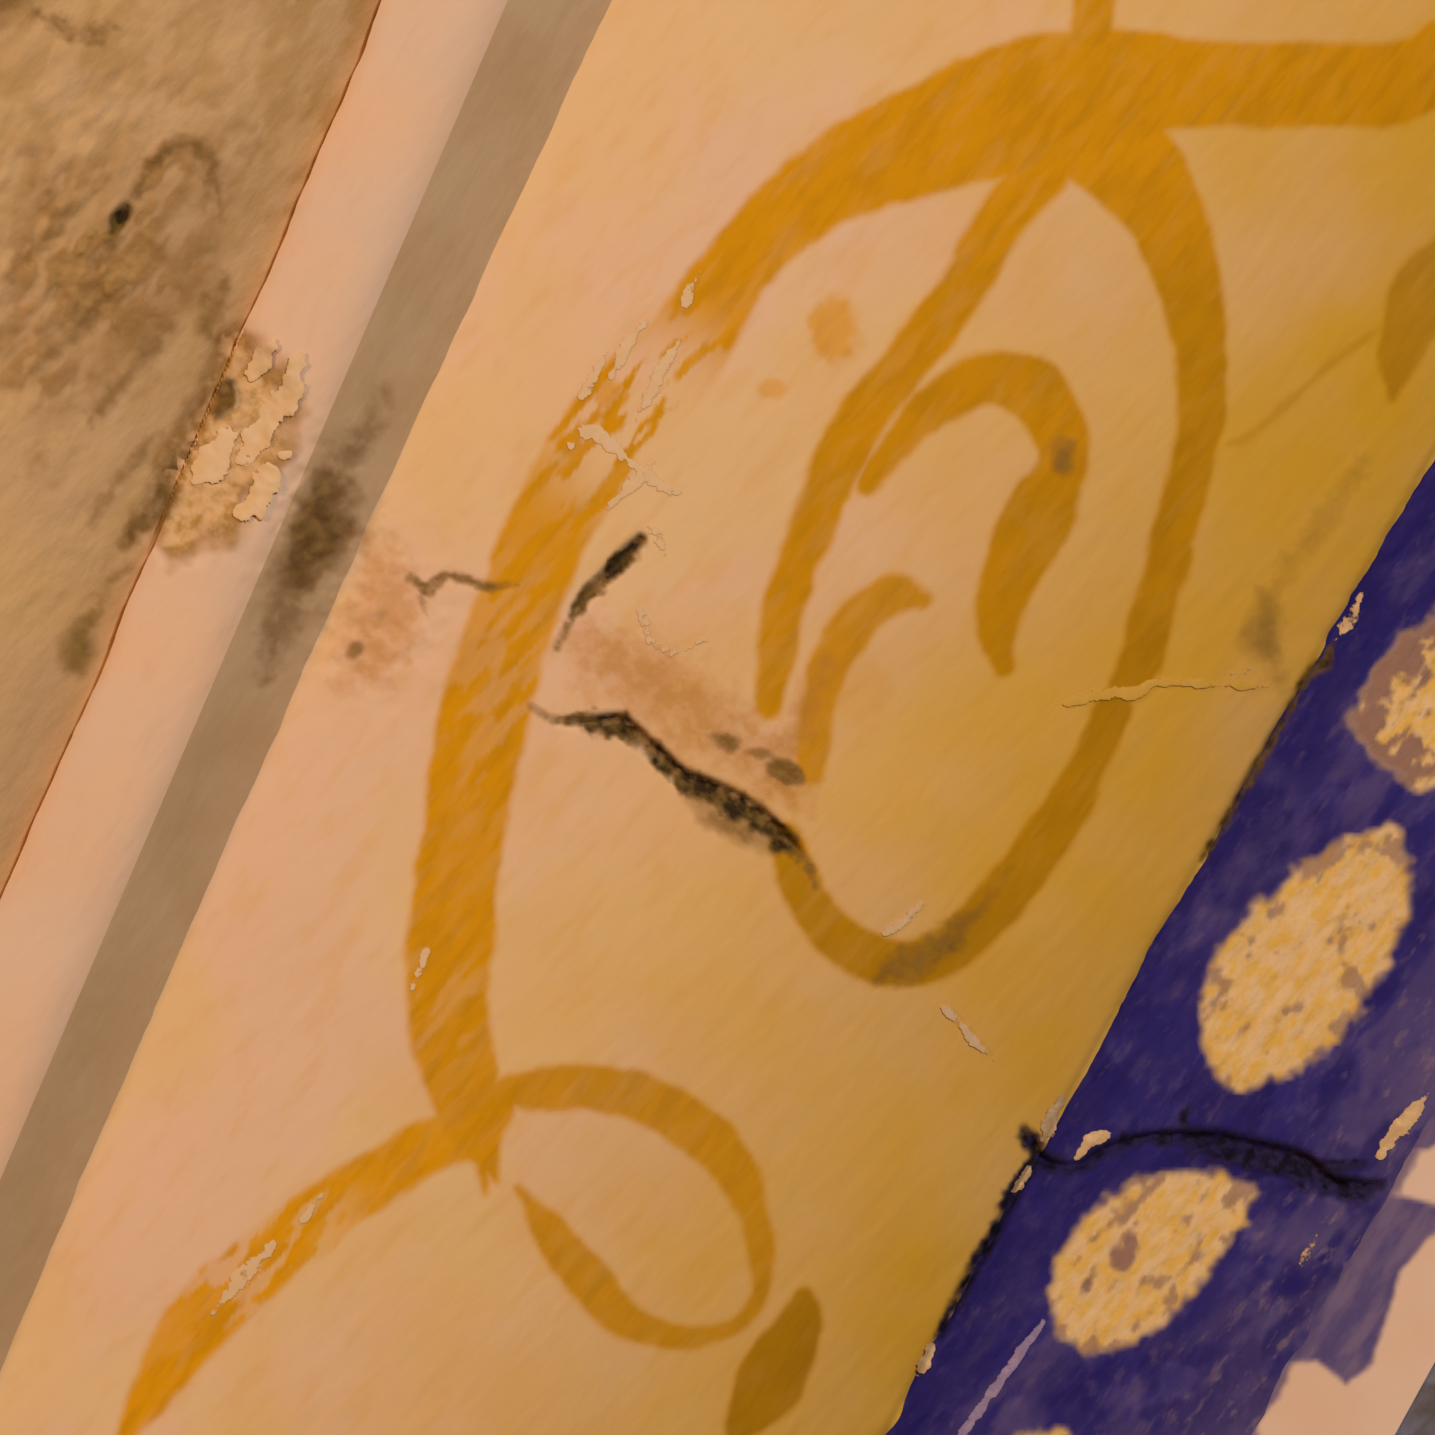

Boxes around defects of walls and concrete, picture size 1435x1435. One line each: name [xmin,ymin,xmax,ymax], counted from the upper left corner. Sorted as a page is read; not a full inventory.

flaking render [122,326,307,556]
leakage [68,627,89,670]
leakage [288,471,353,584]
crack [556,534,646,650]
crack [557,712,813,873]
crack [936,1094,1384,1336]